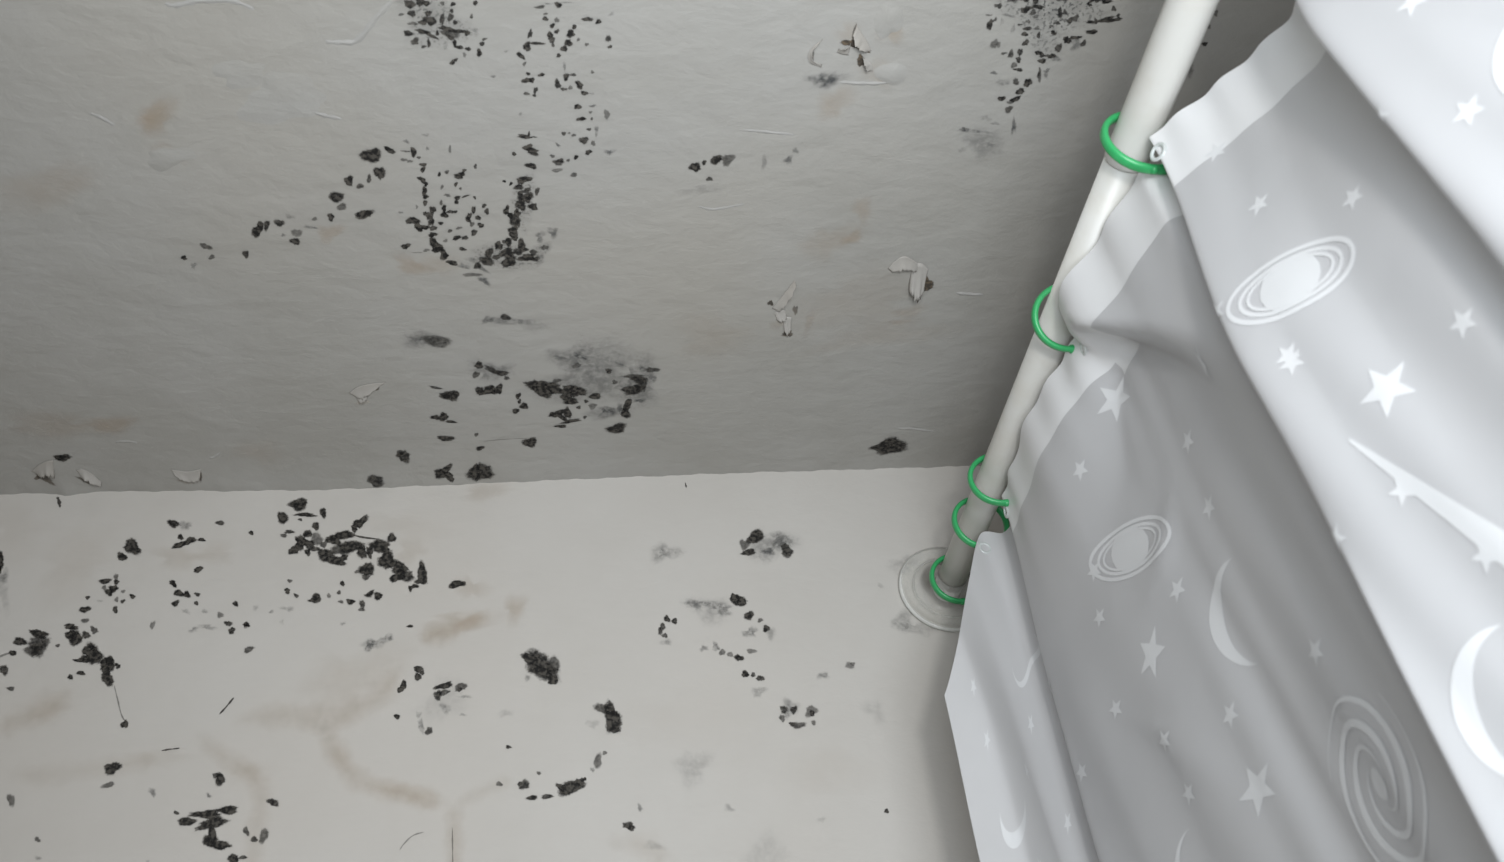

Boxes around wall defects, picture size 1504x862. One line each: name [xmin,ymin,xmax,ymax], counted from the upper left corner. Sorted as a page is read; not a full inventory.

peeling [837,27,873,72]
water stain [987,0,1122,130]
water stain [327,0,612,284]
peeling [767,281,797,338]
peeling [888,256,933,304]
water stain [430,361,660,441]
water stain [277,498,427,611]
water stain [0,538,141,691]
water stain [521,650,559,684]
water stain [595,701,622,733]
water stain [497,751,607,800]
water stain [174,773,268,862]